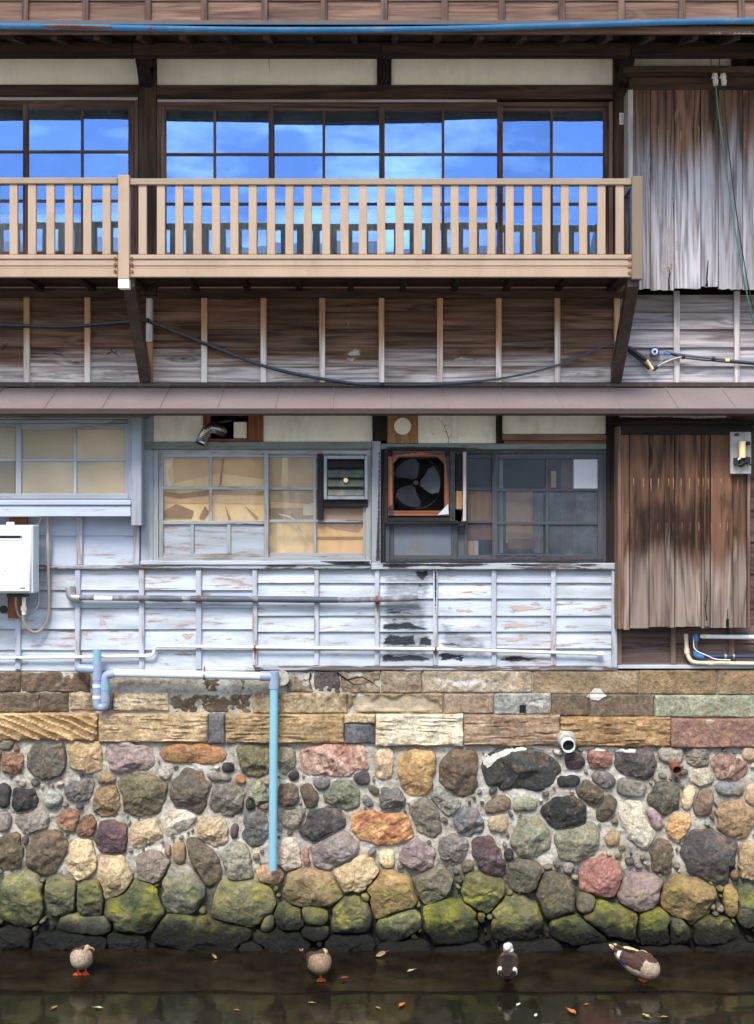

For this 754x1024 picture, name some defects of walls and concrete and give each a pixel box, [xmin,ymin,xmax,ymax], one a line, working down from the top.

peeling [499,602,544,646]
crack [336,672,378,687]